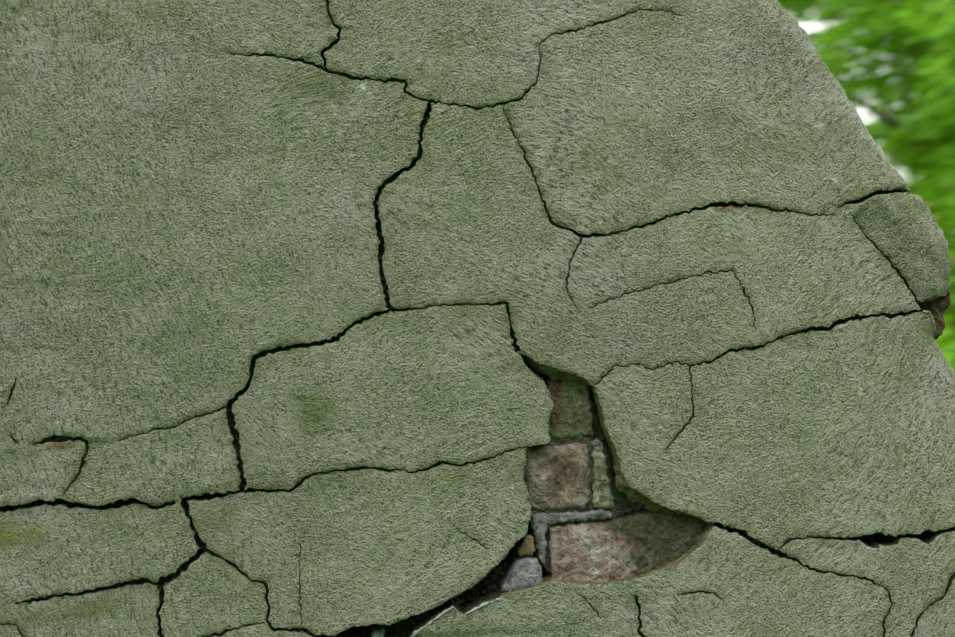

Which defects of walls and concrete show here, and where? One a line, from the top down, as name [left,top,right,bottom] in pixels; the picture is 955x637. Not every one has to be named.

crack [0,0,682,637]
crack [503,107,835,308]
crack [588,189,923,451]
spalling [500,352,714,594]
crack [678,590,724,602]
crack [713,522,955,637]